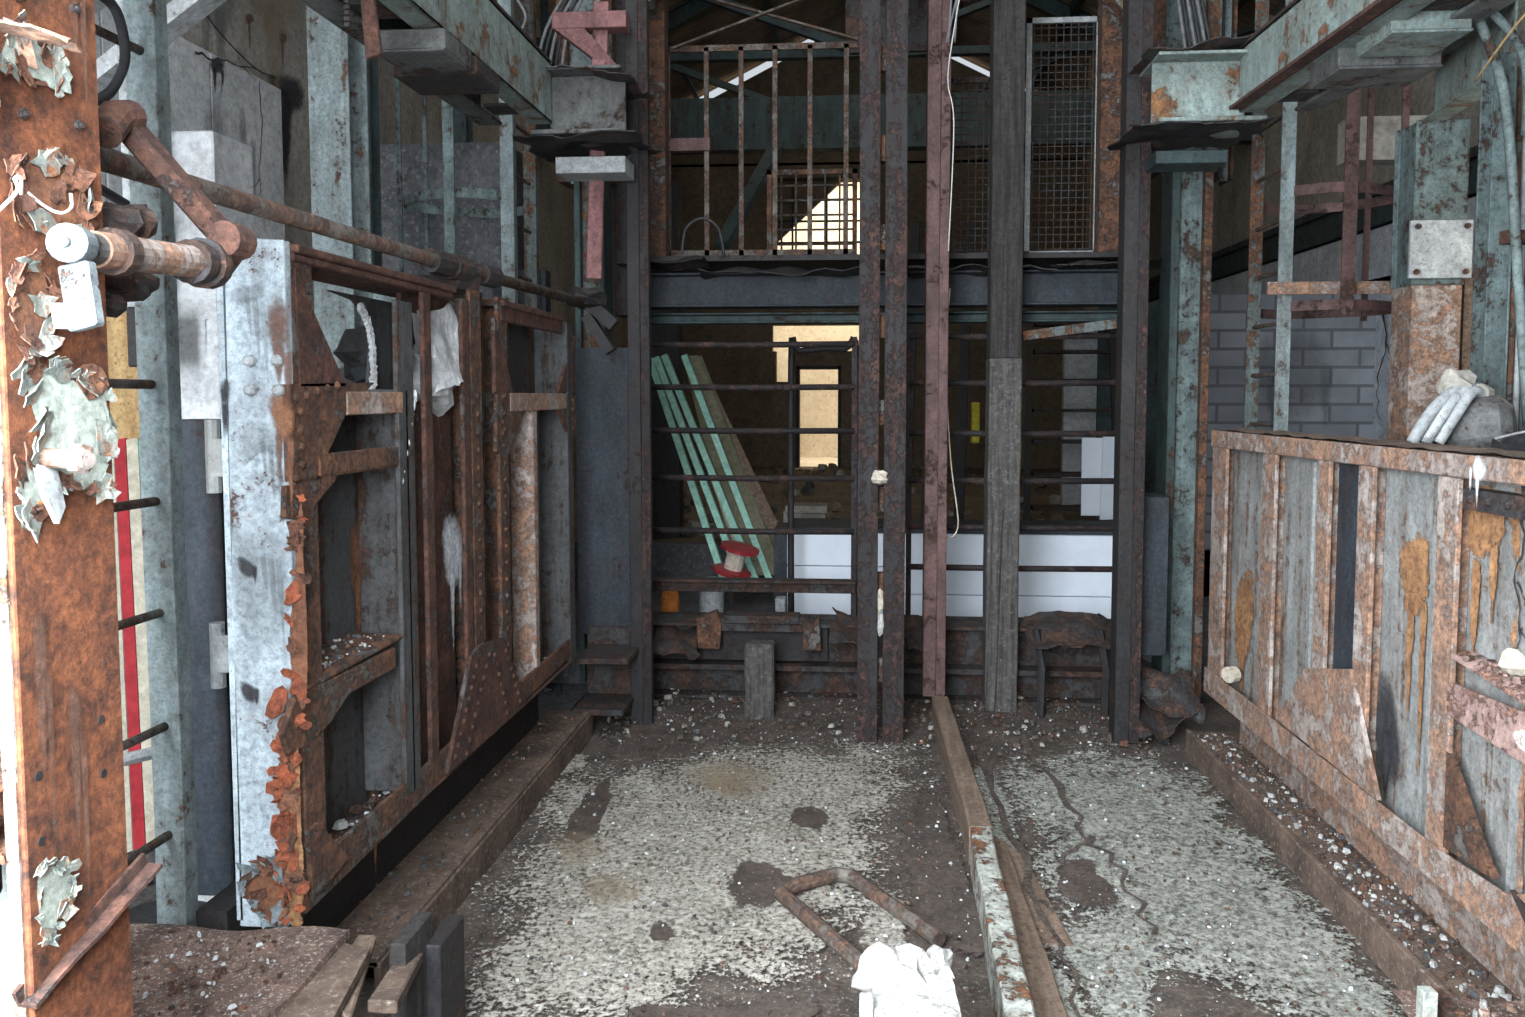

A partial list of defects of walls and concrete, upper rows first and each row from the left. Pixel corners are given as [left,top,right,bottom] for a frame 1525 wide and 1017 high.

peeling [0,9,73,98]
peeling [3,146,121,543]
rust [268,301,294,503]
peeling [235,494,313,929]
rust [350,525,361,632]
rust [1232,568,1254,695]
rust [1399,532,1430,776]
rust [1468,510,1521,652]
rust [1513,729,1525,752]